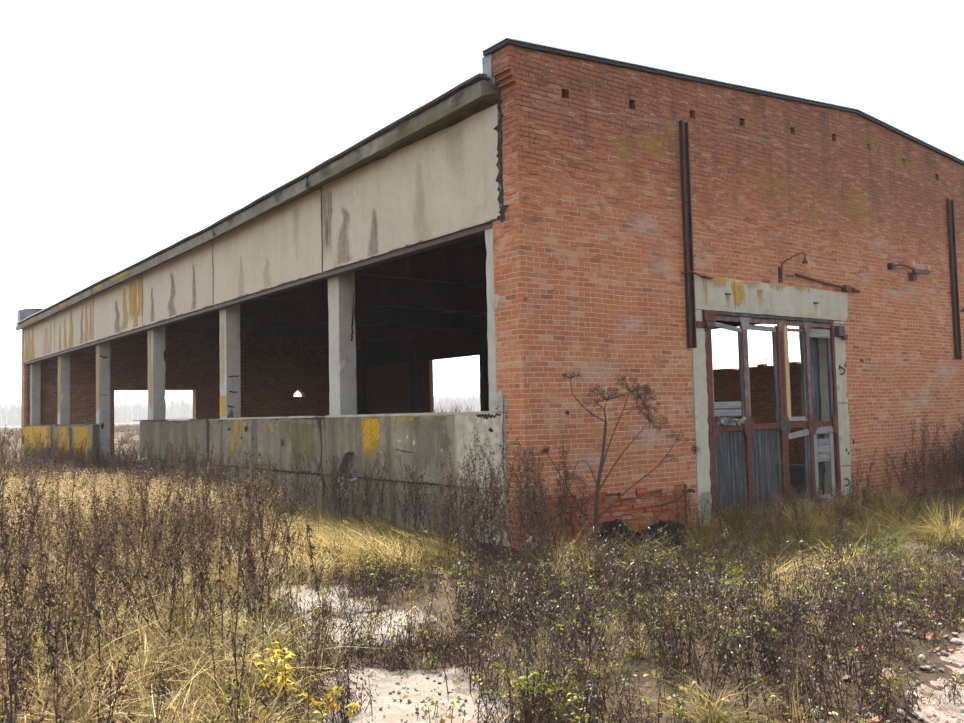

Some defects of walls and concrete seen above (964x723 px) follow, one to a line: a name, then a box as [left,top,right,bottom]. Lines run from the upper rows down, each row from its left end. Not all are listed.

spalling [542,484,686,547]